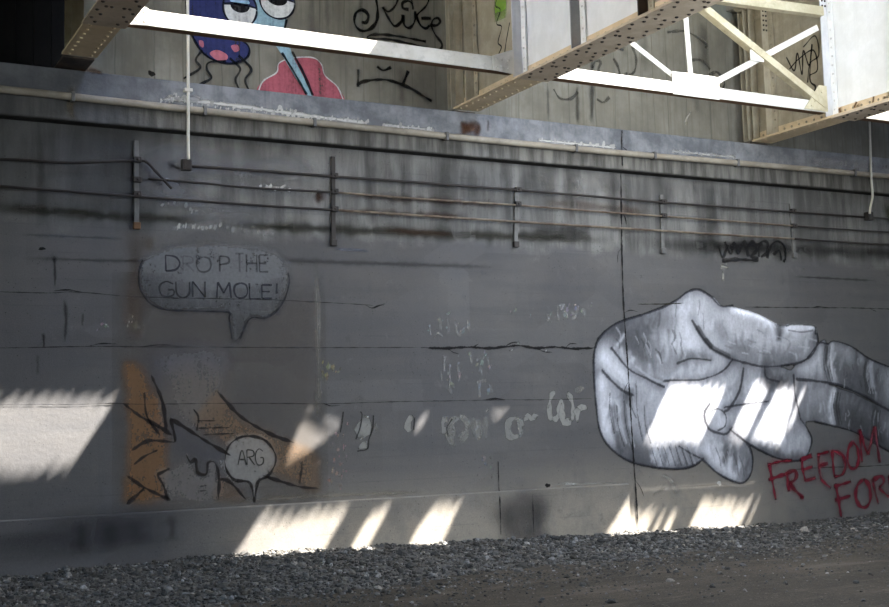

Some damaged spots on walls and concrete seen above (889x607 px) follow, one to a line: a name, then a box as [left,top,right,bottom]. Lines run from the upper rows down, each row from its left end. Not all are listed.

rust [462,123,481,135]
leakage [264,224,578,241]
crack [12,341,179,349]
crack [213,342,597,354]